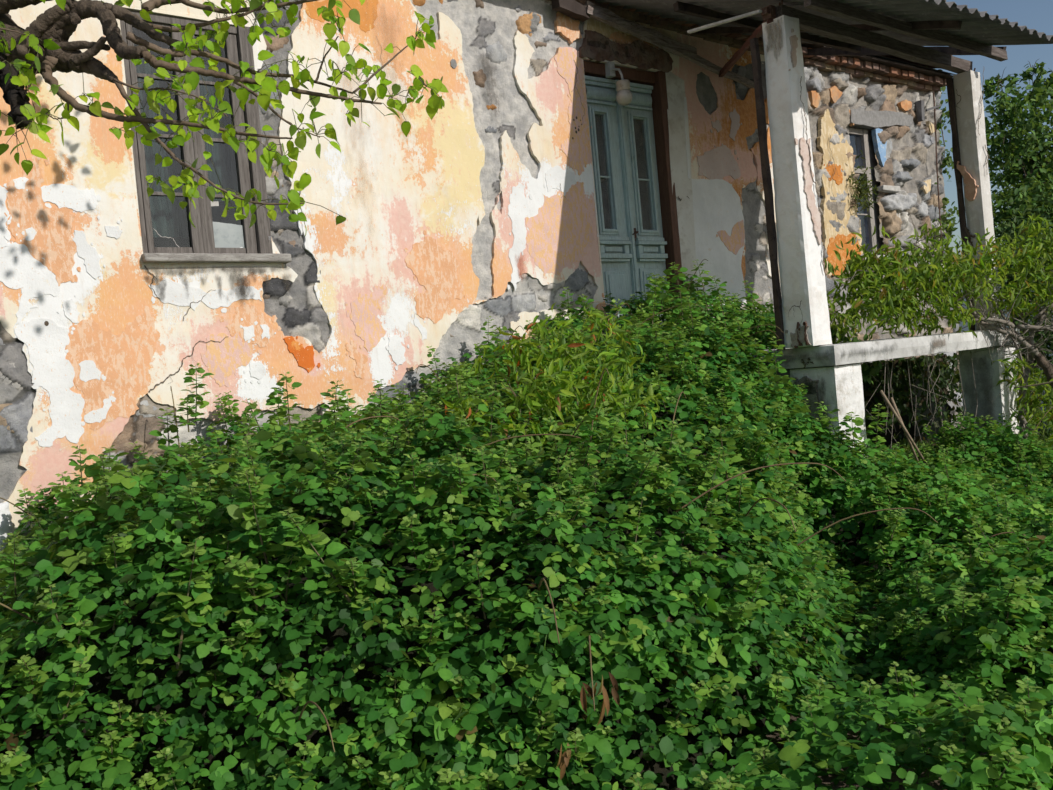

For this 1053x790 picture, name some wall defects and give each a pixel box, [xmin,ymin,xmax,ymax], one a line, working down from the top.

crack [148,337,226,392]
spalling [0,0,379,503]
damp [170,267,269,298]
spalling [344,0,604,411]
peeling [692,61,774,318]
peeling [794,137,822,245]